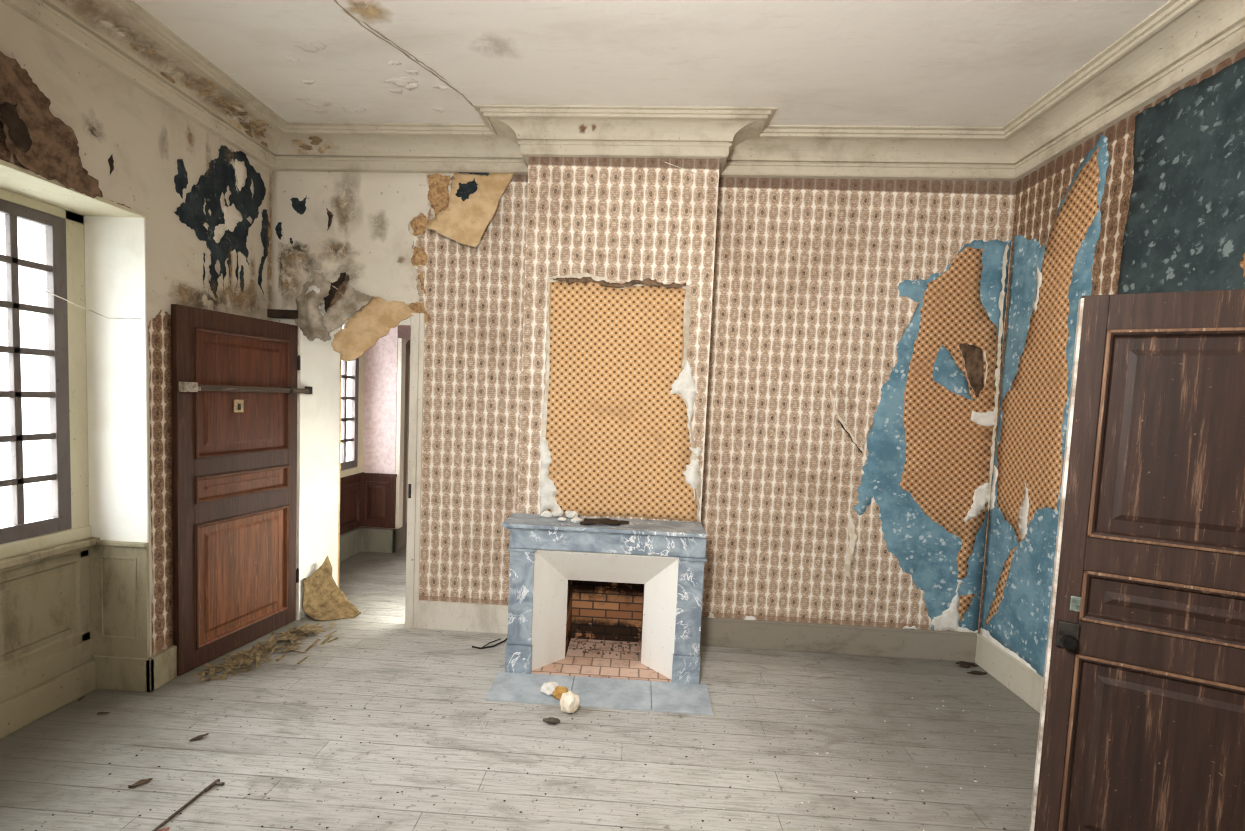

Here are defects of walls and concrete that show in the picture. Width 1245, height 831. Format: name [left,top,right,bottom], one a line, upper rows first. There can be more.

crack [334,0,478,112]
peeling [161,72,269,148]
peeling [292,136,330,154]
damp [177,189,356,310]
flaking render [174,145,454,326]
flaking render [1032,266,1042,312]
peeling [670,359,701,498]
flaking render [971,411,994,426]
peeling [540,437,560,513]
flaking render [964,465,998,522]
flaking render [1018,482,1029,540]
flaking render [902,580,1037,673]